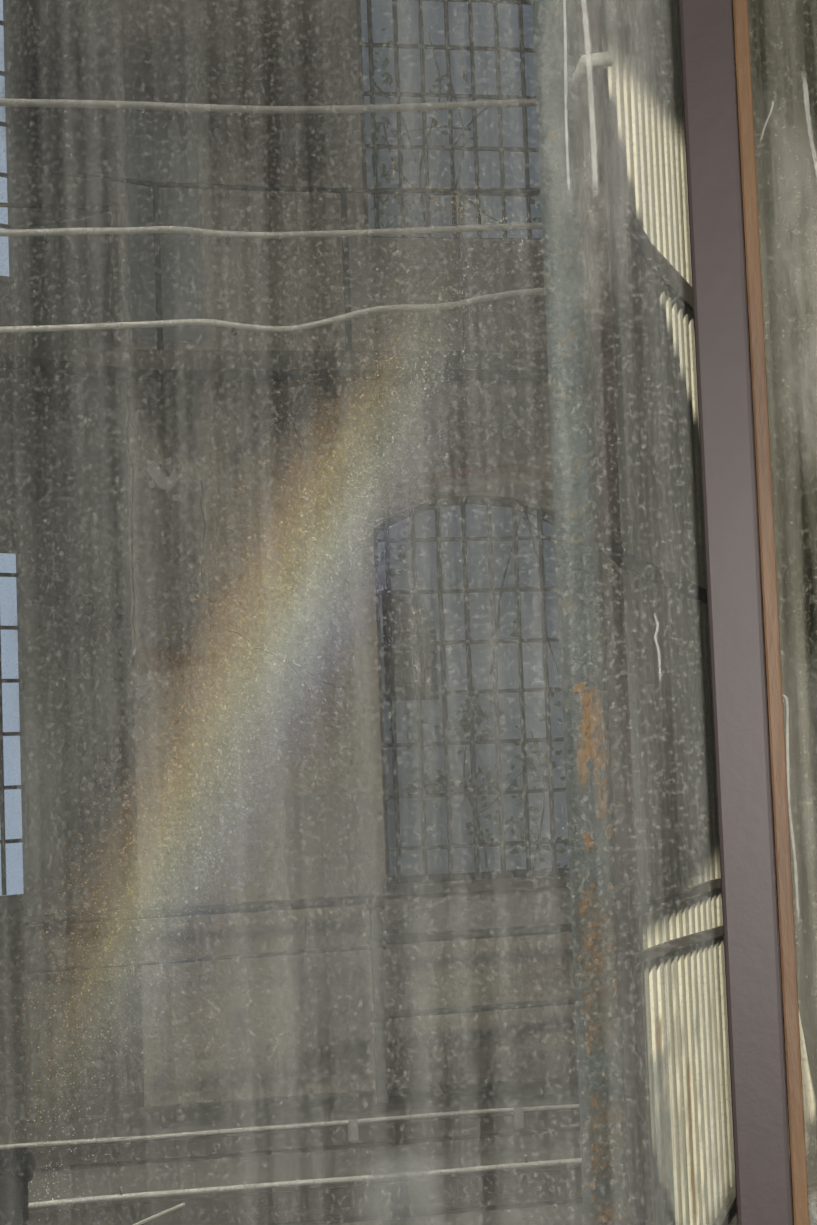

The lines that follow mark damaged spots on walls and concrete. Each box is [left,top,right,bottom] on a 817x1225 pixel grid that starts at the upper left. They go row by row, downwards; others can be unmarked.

leakage [225,386,307,451]
corrosion [577,882,670,1225]
leakage [140,1056,579,1127]